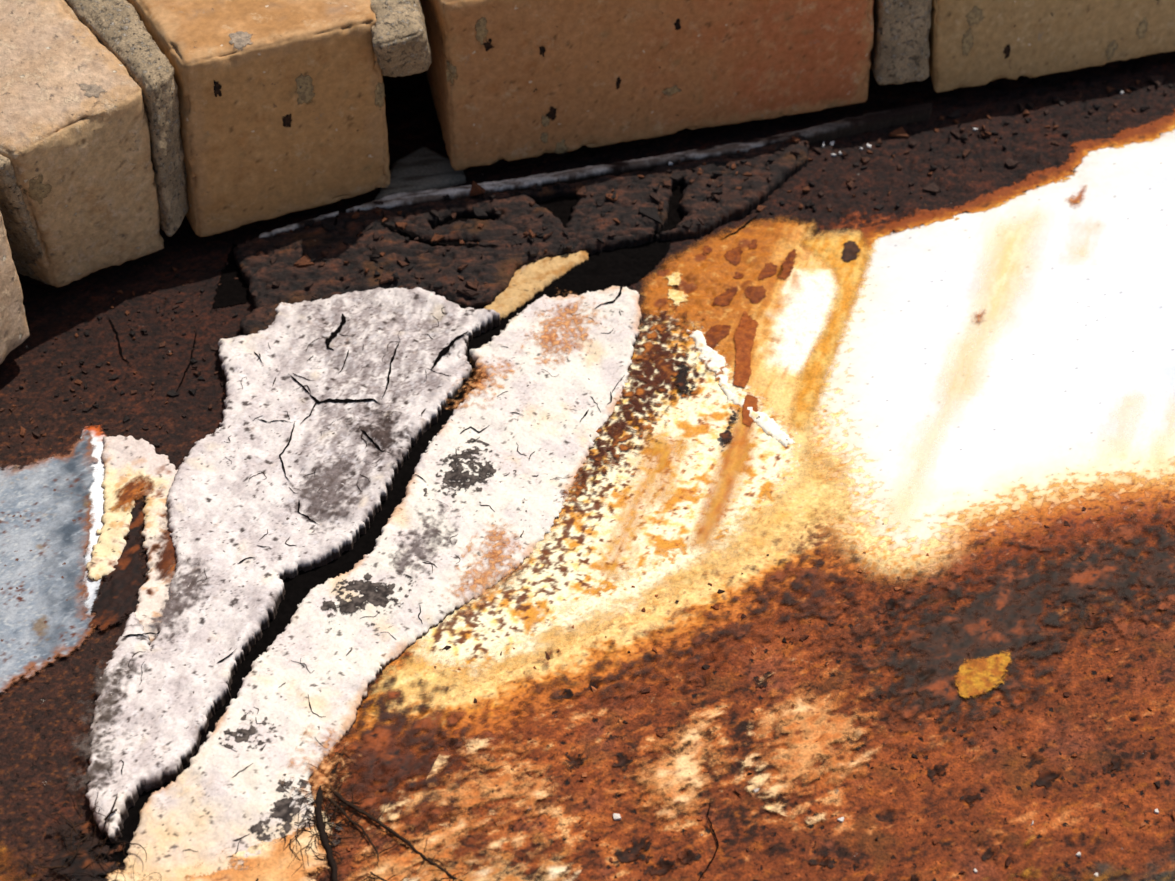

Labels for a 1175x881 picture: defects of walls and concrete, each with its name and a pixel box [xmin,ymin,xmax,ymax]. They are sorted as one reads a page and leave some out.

crack [381,213,497,248]
peeling [0,426,178,692]
corrosion [41,336,227,447]
crack [102,221,675,878]
corrosion [186,76,1175,881]
corrosion [107,869,157,881]